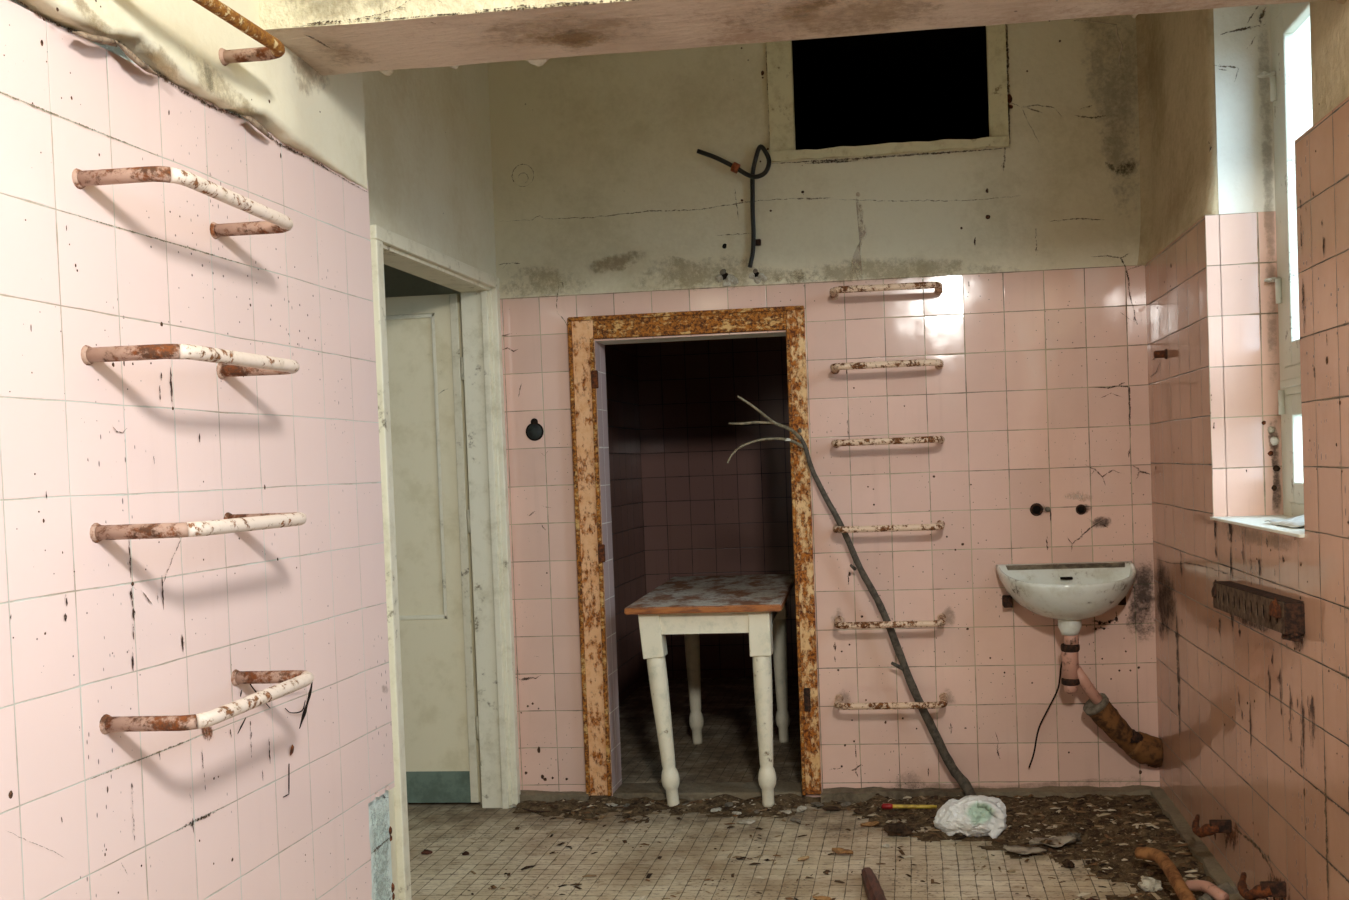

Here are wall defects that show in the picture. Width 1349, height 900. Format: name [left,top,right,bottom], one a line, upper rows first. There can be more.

flaking render [20,1,367,192]
water stain [1129,562,1182,636]
spalling [371,795,395,900]